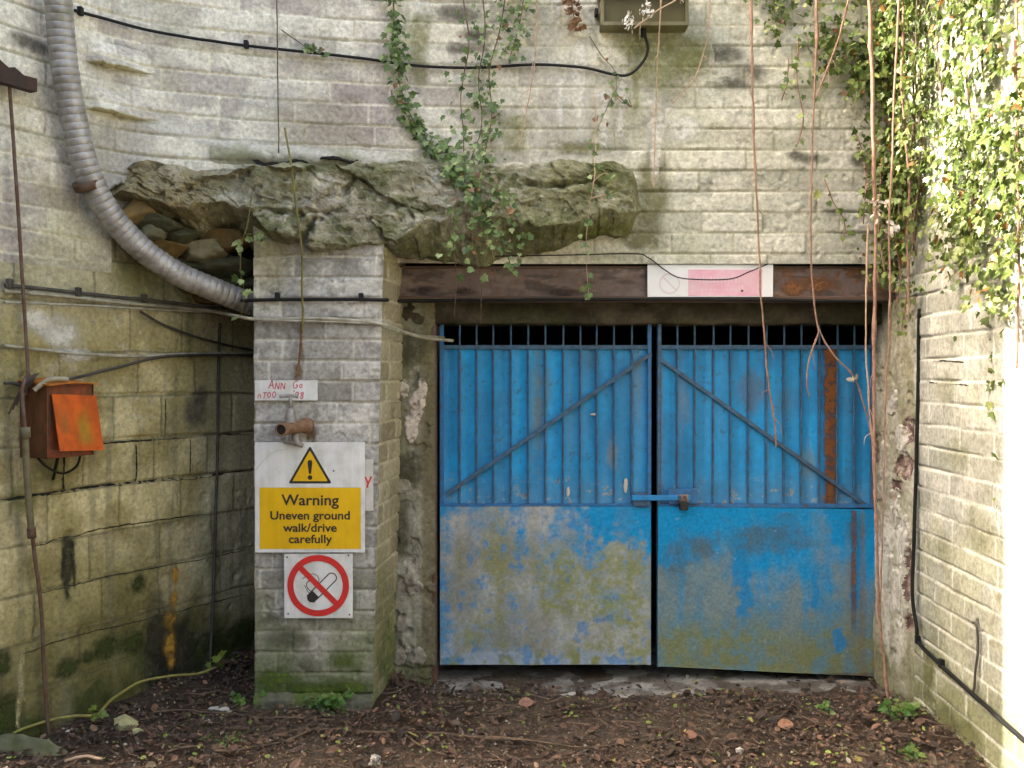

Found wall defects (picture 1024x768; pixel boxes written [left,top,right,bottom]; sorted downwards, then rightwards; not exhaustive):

peeling [399,378,427,444]
peeling [887,389,915,633]
damp [61,539,76,598]
peeling [397,523,424,596]
damp [146,602,255,689]
peeling [394,612,427,666]